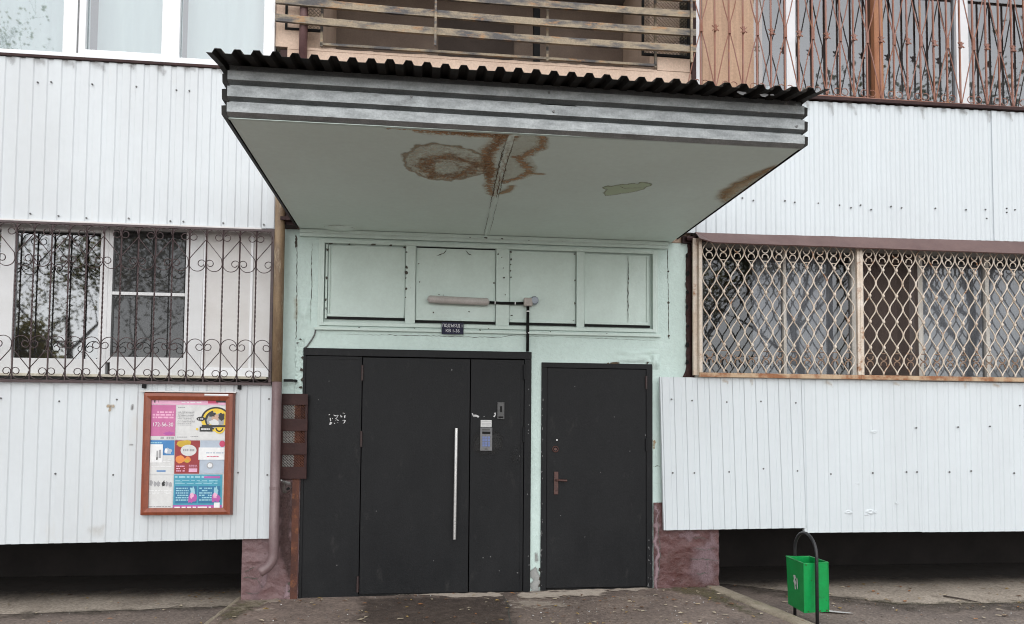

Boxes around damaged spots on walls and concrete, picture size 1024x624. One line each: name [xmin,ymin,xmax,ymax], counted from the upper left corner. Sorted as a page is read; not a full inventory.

corrosion [387,128,547,196]
crack [437,135,519,256]
peeling [603,182,652,196]
corrosion [722,167,773,201]